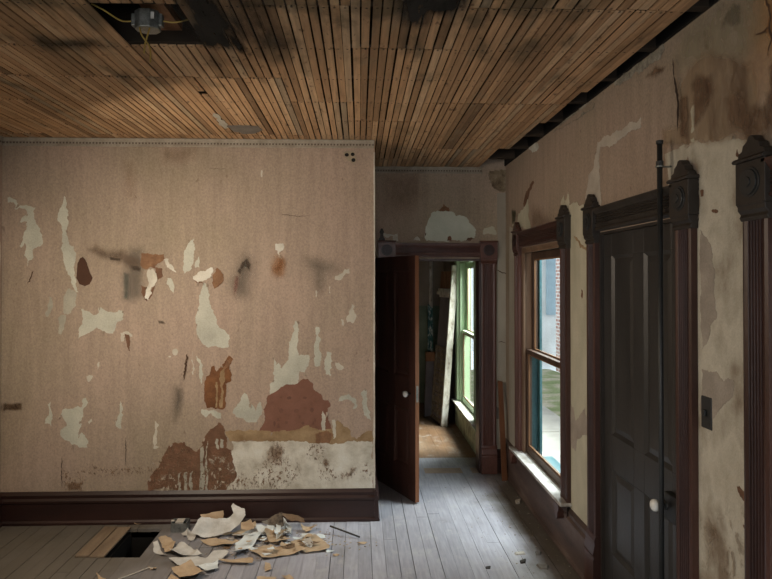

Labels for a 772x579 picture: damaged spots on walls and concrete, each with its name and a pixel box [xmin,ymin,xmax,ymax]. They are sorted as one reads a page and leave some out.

peeling [8,197,43,266]
peeling [45,196,132,351]
flaking render [140,152,398,491]
flaking render [412,169,534,449]
flaking render [561,117,641,525]
peeling [45,398,92,449]
water stain [307,445,370,479]